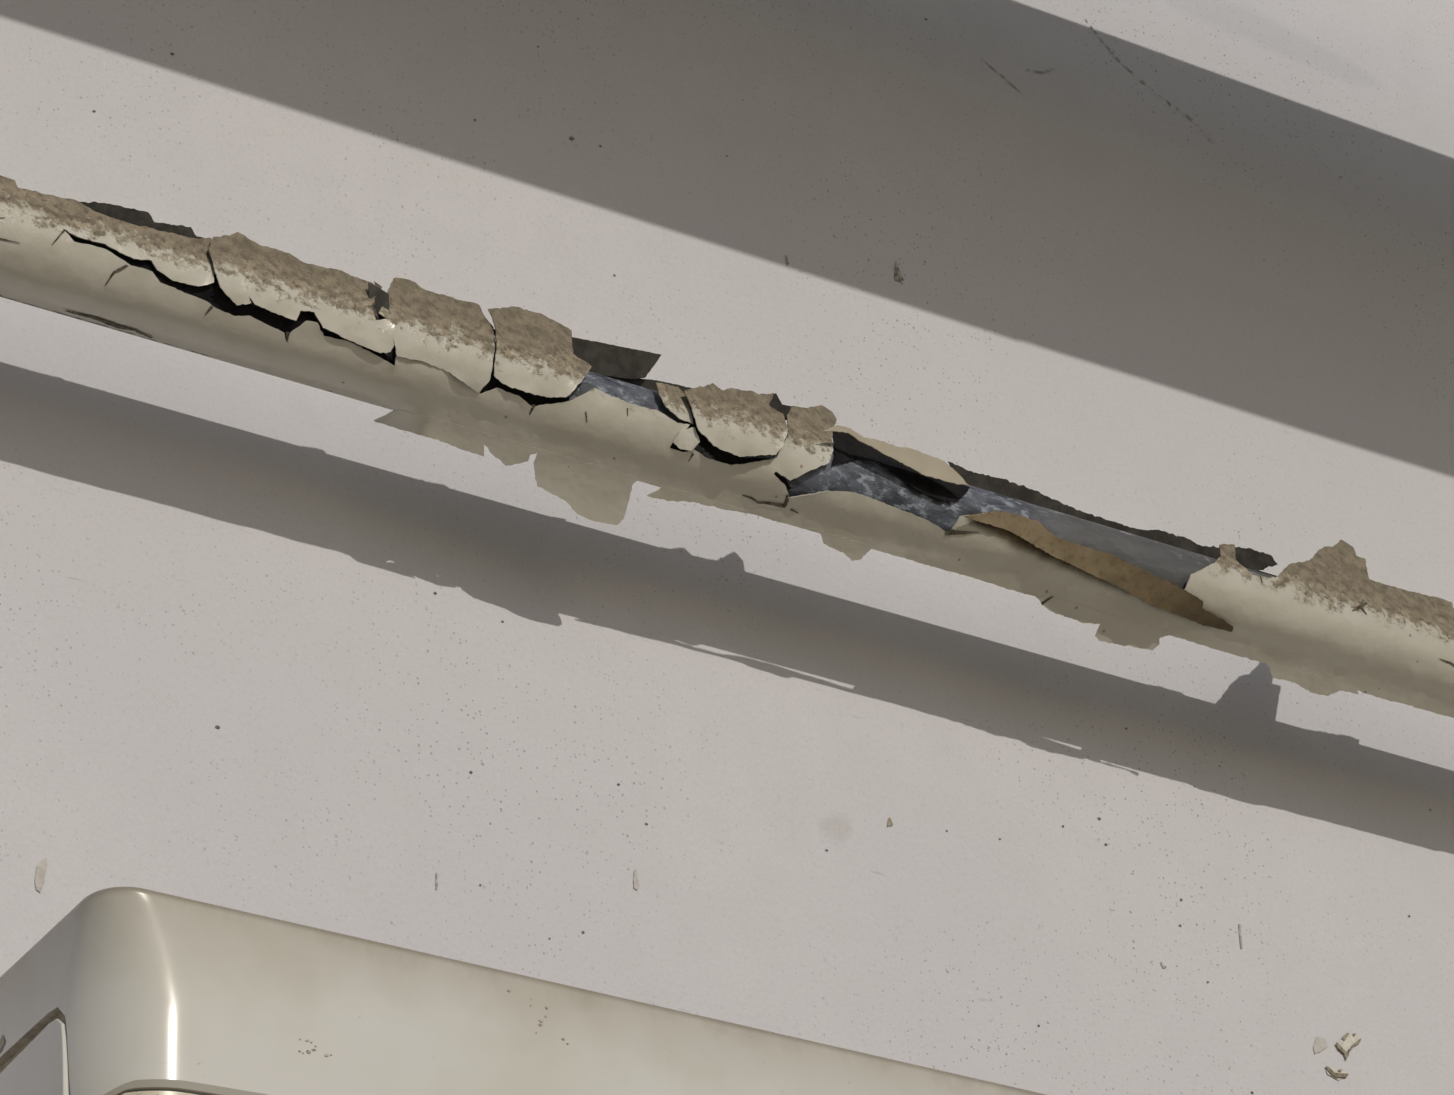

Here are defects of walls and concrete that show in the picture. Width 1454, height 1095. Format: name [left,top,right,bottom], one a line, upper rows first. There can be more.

crack [0,217,396,365]
peeling [80,202,792,457]
peeling [374,410,752,525]
peeling [810,528,871,561]
peeling [823,425,1278,632]
peeling [1036,596,1168,650]
peeling [1267,661,1358,696]
spalling [1325,1033,1361,1080]